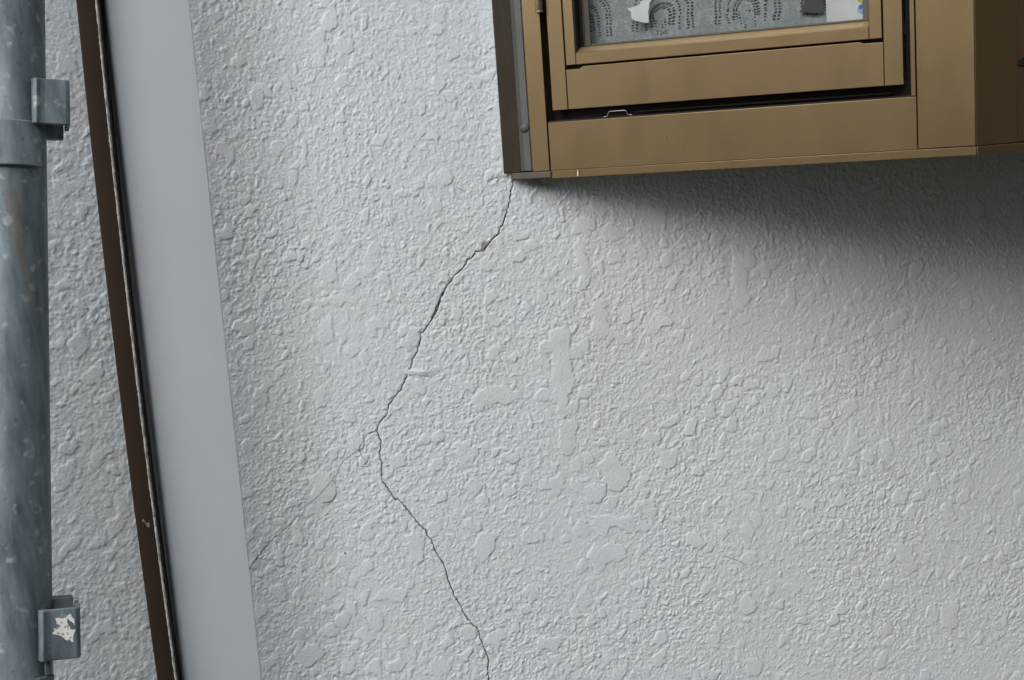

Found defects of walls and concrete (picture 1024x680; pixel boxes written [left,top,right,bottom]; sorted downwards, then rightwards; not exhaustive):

crack [249,179,515,680]